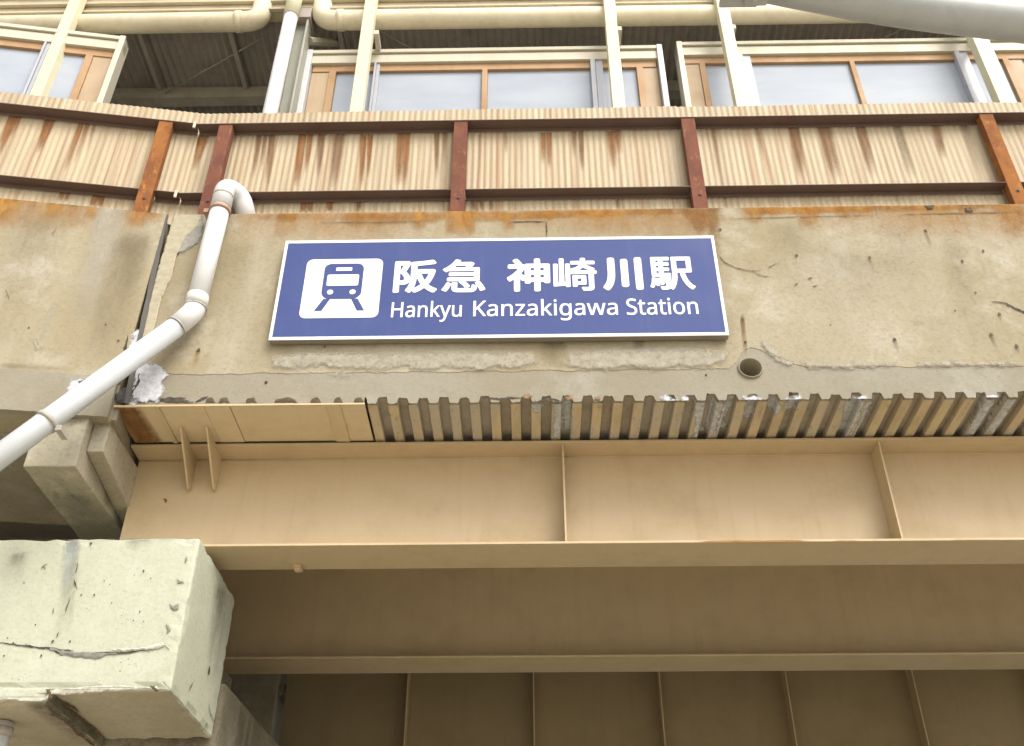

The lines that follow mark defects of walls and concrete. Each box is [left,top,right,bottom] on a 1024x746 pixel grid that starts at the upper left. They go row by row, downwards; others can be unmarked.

rust [1,116,21,146]
rust [255,135,275,170]
rust [296,134,344,177]
rust [360,134,373,173]
rust [396,133,410,177]
rust [789,128,802,162]
rust [818,127,834,165]
rust [394,193,715,230]
rust [744,204,1022,221]
peeling [705,396,734,437]
peeling [983,395,1016,432]
crack [0,563,168,654]